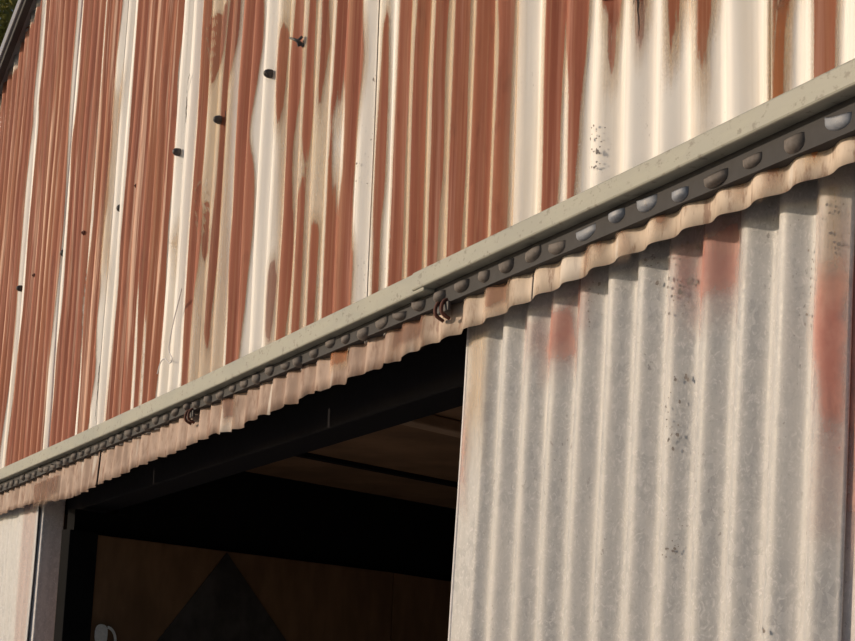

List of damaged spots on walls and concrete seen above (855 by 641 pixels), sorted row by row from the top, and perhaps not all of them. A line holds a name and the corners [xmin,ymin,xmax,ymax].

corrosion [0,0,123,467]
corrosion [106,0,185,421]
corrosion [181,0,265,386]
corrosion [265,0,365,343]
corrosion [371,0,516,295]
corrosion [541,0,590,212]
corrosion [602,0,622,74]
corrosion [696,0,711,73]
corrosion [697,224,739,299]
corrosion [772,0,791,99]
corrosion [813,0,838,78]
corrosion [812,256,855,512]